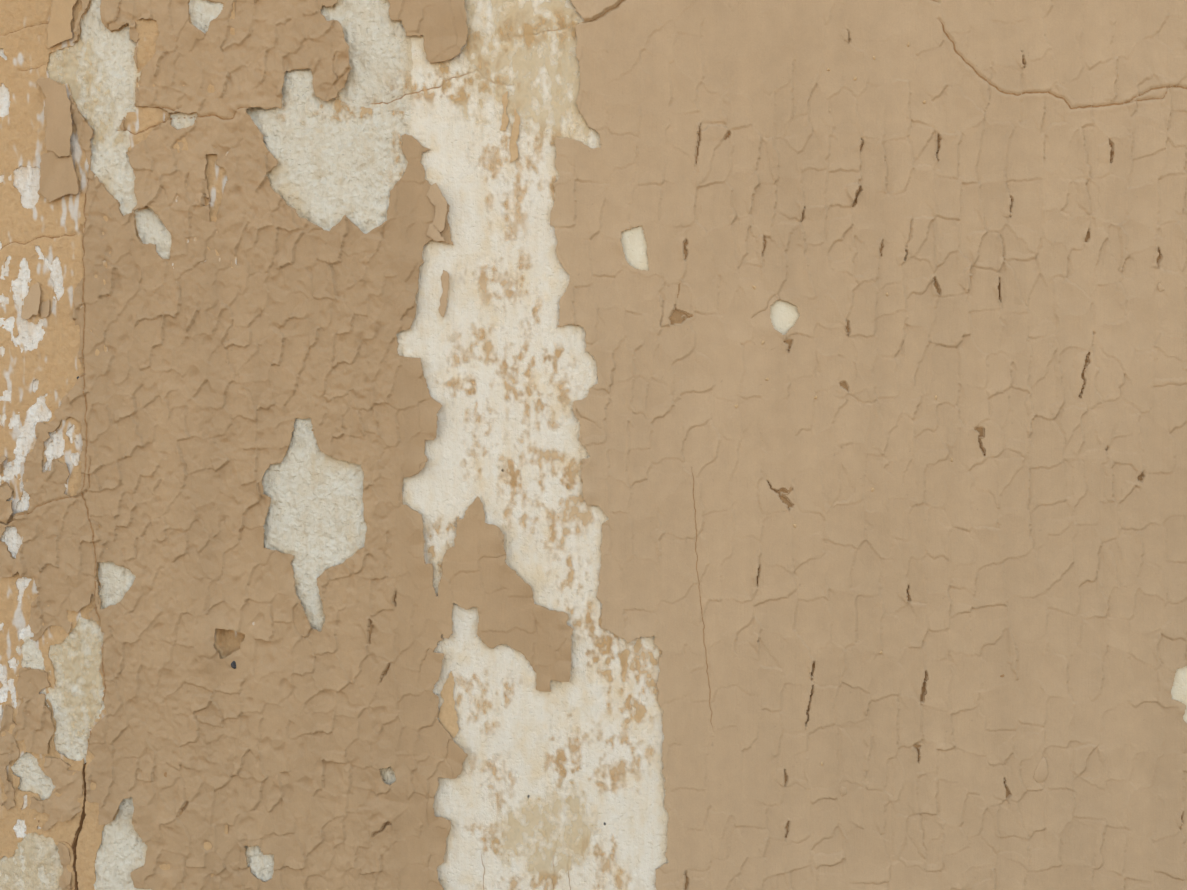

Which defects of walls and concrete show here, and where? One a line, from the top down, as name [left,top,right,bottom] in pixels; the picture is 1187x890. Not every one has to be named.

crack [932,0,1187,109]
peeling [36,0,171,259]
crack [670,240,692,325]
crack [1079,352,1090,398]
crack [0,178,106,702]
peeling [239,0,669,890]
crack [975,428,986,456]
crack [768,482,794,508]
crack [921,672,929,701]
peeling [1171,666,1187,723]
crack [61,730,91,890]
peeling [0,832,63,890]